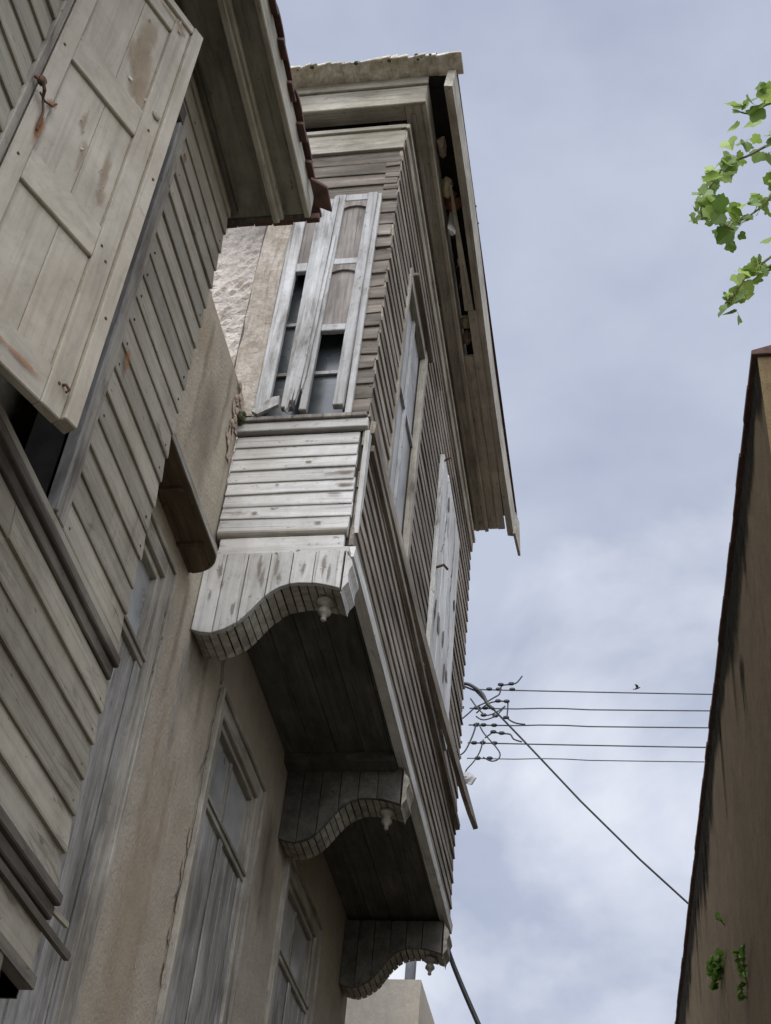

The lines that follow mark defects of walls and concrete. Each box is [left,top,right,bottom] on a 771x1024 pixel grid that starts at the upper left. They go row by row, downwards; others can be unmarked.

crack [154,659,226,1020]